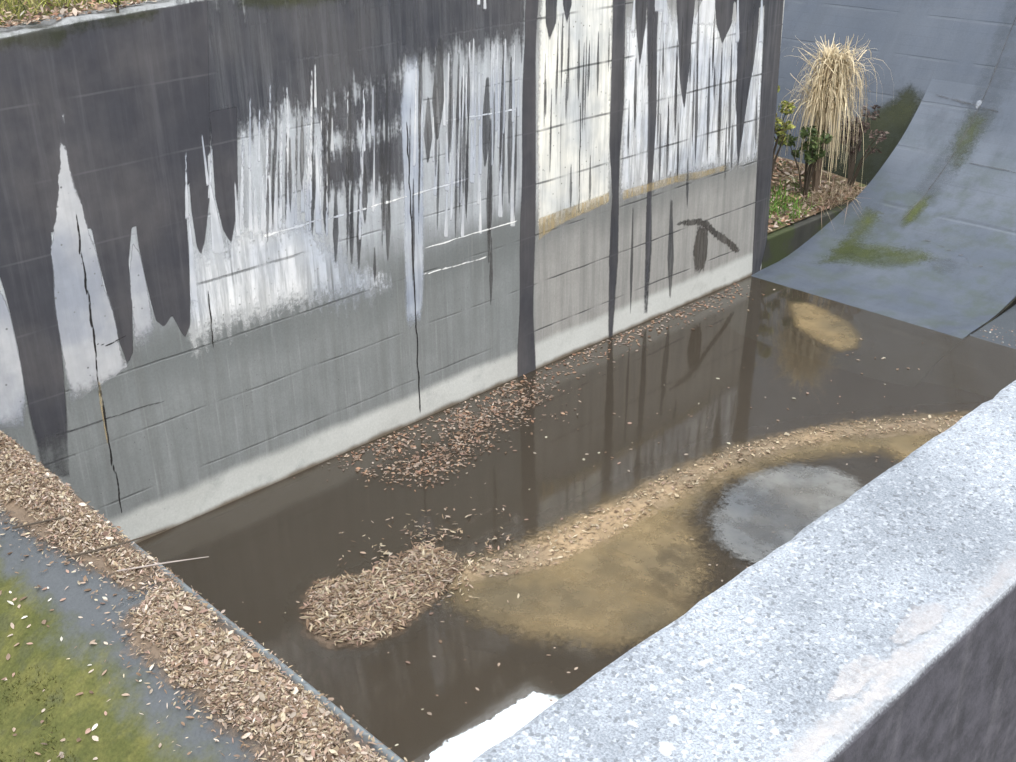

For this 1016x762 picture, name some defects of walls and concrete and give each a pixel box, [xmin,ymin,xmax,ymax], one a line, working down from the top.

crack [76,215,125,513]
water stain [0,0,784,476]
crack [406,122,421,411]